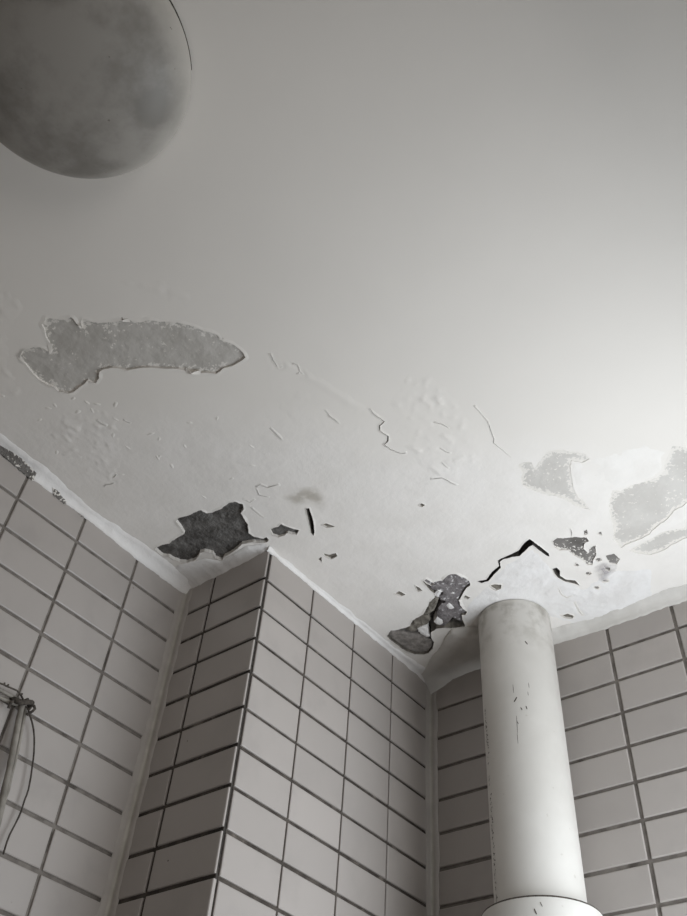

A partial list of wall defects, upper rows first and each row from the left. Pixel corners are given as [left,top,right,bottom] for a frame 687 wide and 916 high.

peeling [17,314,249,396]
spalling [153,500,301,563]
peeling [518,450,590,510]
peeling [551,445,687,589]
spalling [385,572,472,655]
crack [476,538,584,615]